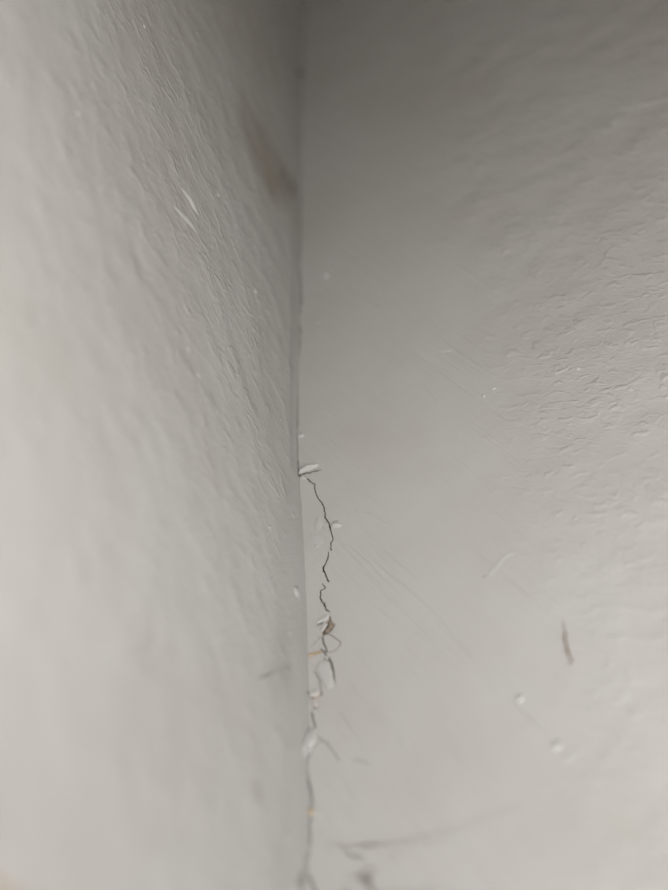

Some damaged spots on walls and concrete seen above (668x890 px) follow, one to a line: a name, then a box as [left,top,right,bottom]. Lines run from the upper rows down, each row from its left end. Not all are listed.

crack [297,384,333,613]
crack [295,636,372,890]